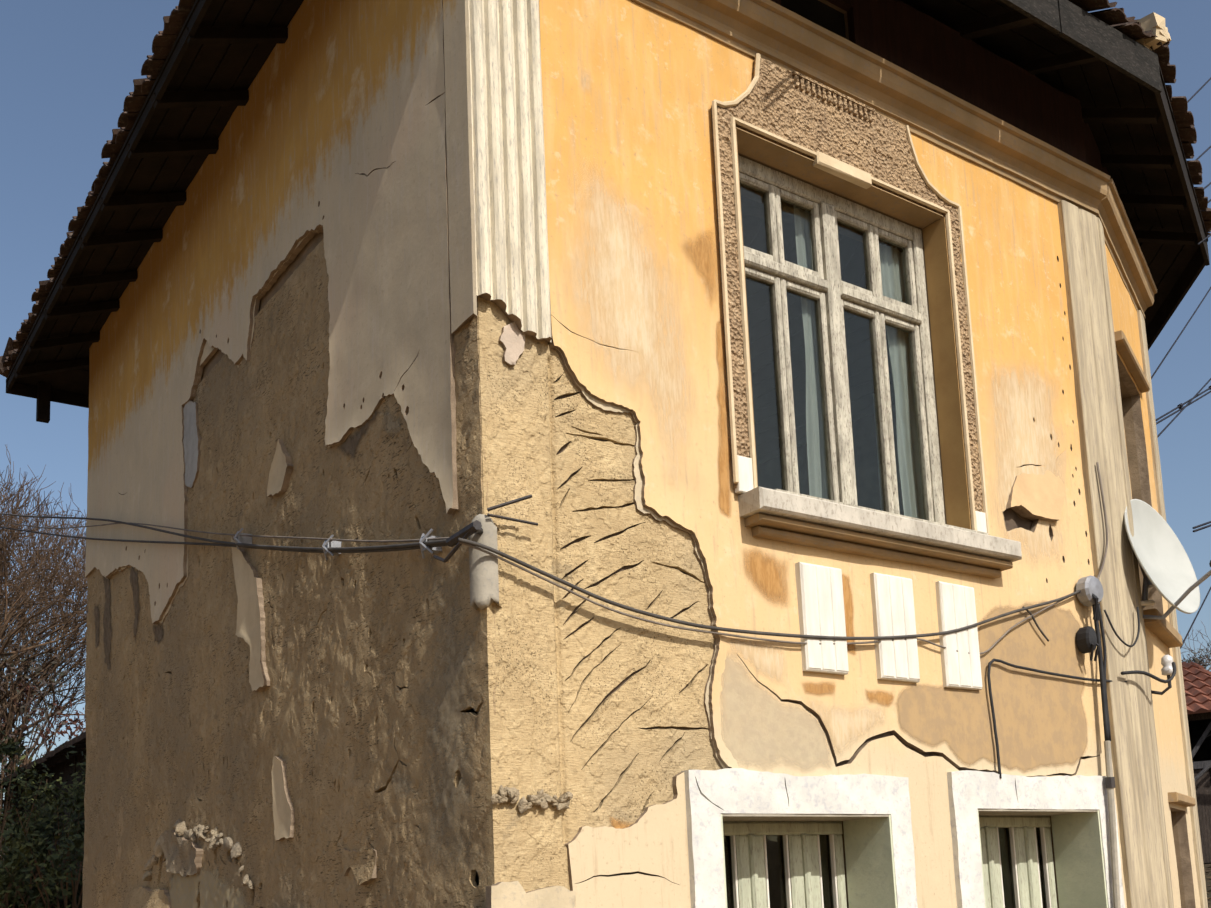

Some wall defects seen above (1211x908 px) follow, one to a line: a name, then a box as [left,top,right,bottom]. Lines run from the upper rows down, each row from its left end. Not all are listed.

peeling [585,186,682,439]
water stain [340,410,399,456]
flaking render [82,238,881,908]
water stain [94,576,112,671]
water stain [130,568,140,640]
crack [780,700,820,725]
crack [835,731,991,772]
crack [1032,756,1094,777]
crack [575,872,654,884]